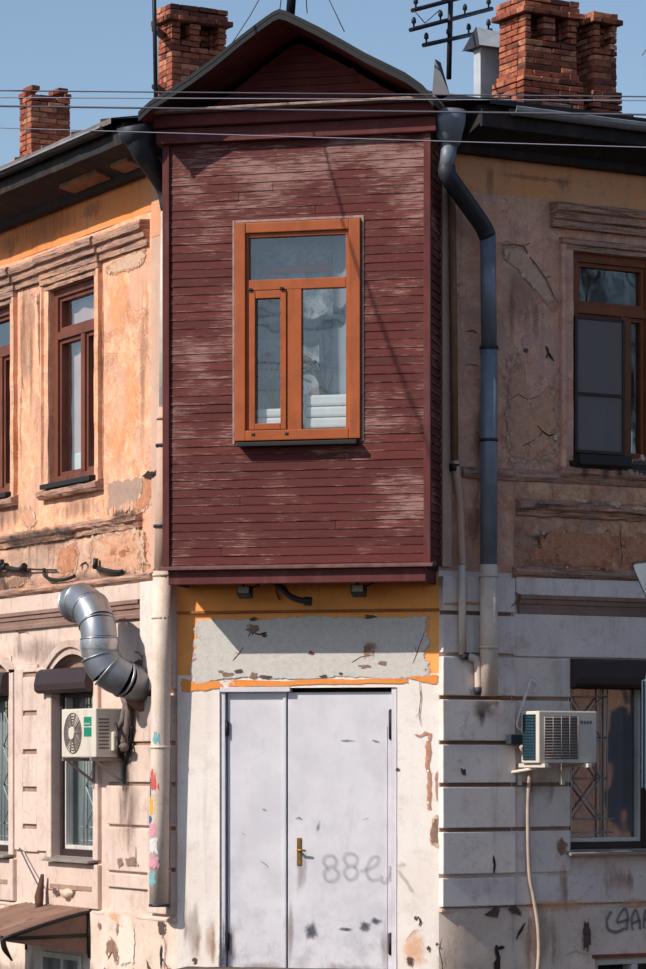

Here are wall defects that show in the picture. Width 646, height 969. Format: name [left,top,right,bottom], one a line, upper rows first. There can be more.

crack [507,243,559,303]
spalling [109,477,151,517]
spalling [56,528,149,577]
spalling [6,574,27,588]
peeling [414,731,440,848]
spalling [97,922,119,969]
spalling [157,920,166,938]
spalling [484,903,523,918]
spalling [582,918,592,954]